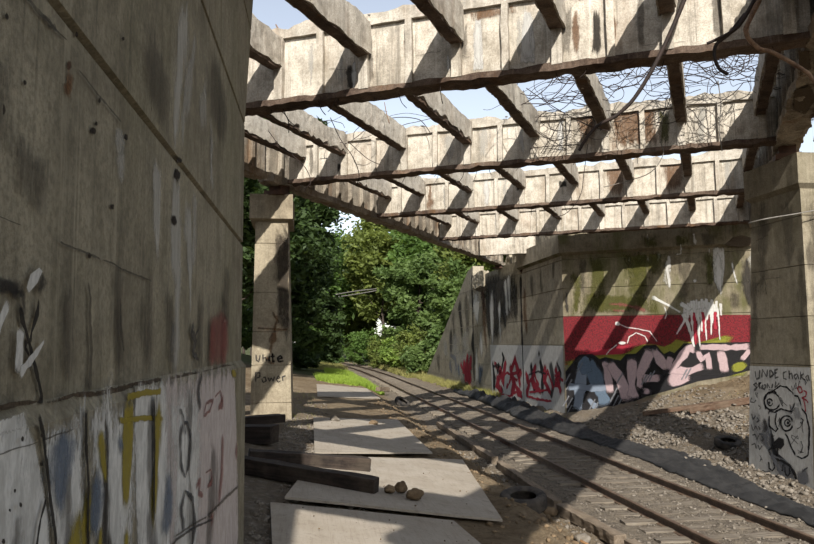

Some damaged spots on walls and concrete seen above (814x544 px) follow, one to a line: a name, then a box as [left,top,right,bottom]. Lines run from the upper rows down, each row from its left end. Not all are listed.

leakage [592,11,601,53]
leakage [346,62,359,89]
spalling [793,86,814,114]
leakage [275,232,289,323]
leakage [565,233,697,313]